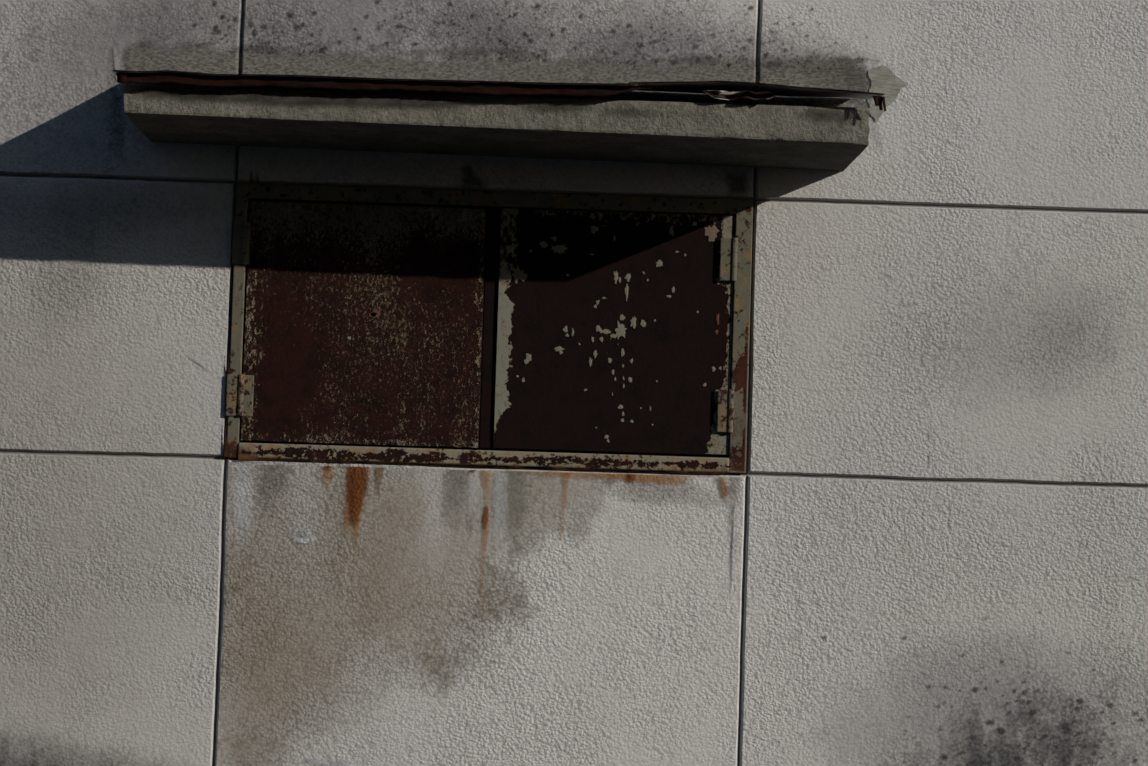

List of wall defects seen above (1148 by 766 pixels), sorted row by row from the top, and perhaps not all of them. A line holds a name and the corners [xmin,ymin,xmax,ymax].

damp [103,0,846,70]
rust [113,70,883,94]
rust [346,466,383,531]
damp [221,478,421,724]
damp [943,671,1142,766]